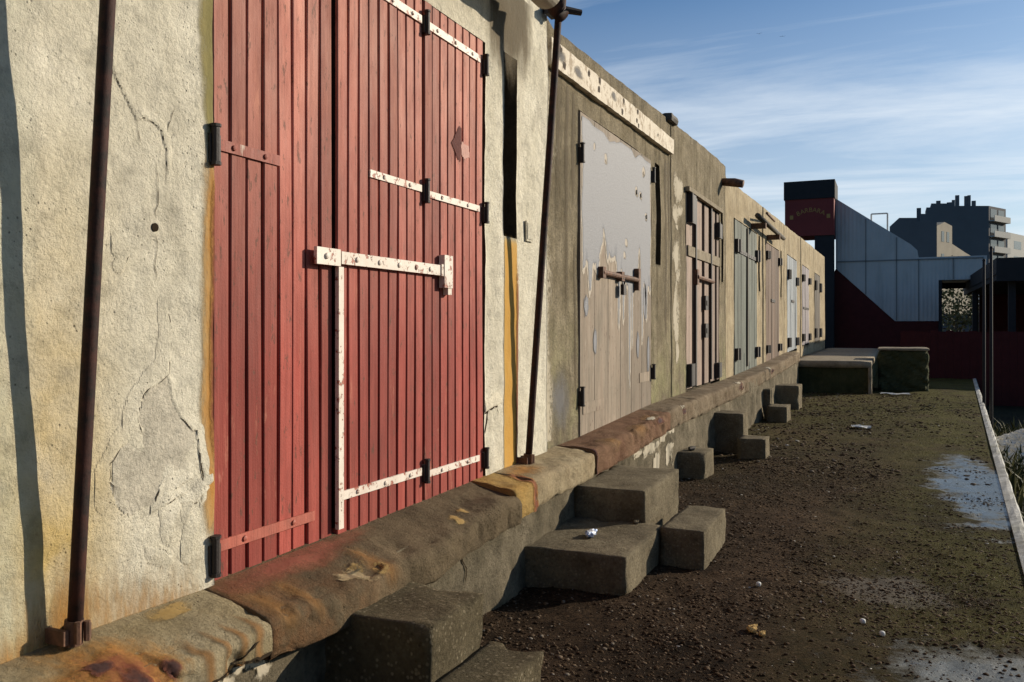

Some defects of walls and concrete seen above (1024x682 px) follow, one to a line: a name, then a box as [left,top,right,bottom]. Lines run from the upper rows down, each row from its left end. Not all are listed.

crack [113,46,175,183]
peeling [581,116,651,389]
rust [201,164,215,531]
spalling [95,295,214,569]
spalling [633,417,674,468]
rust [0,590,264,682]
peeling [333,562,388,581]